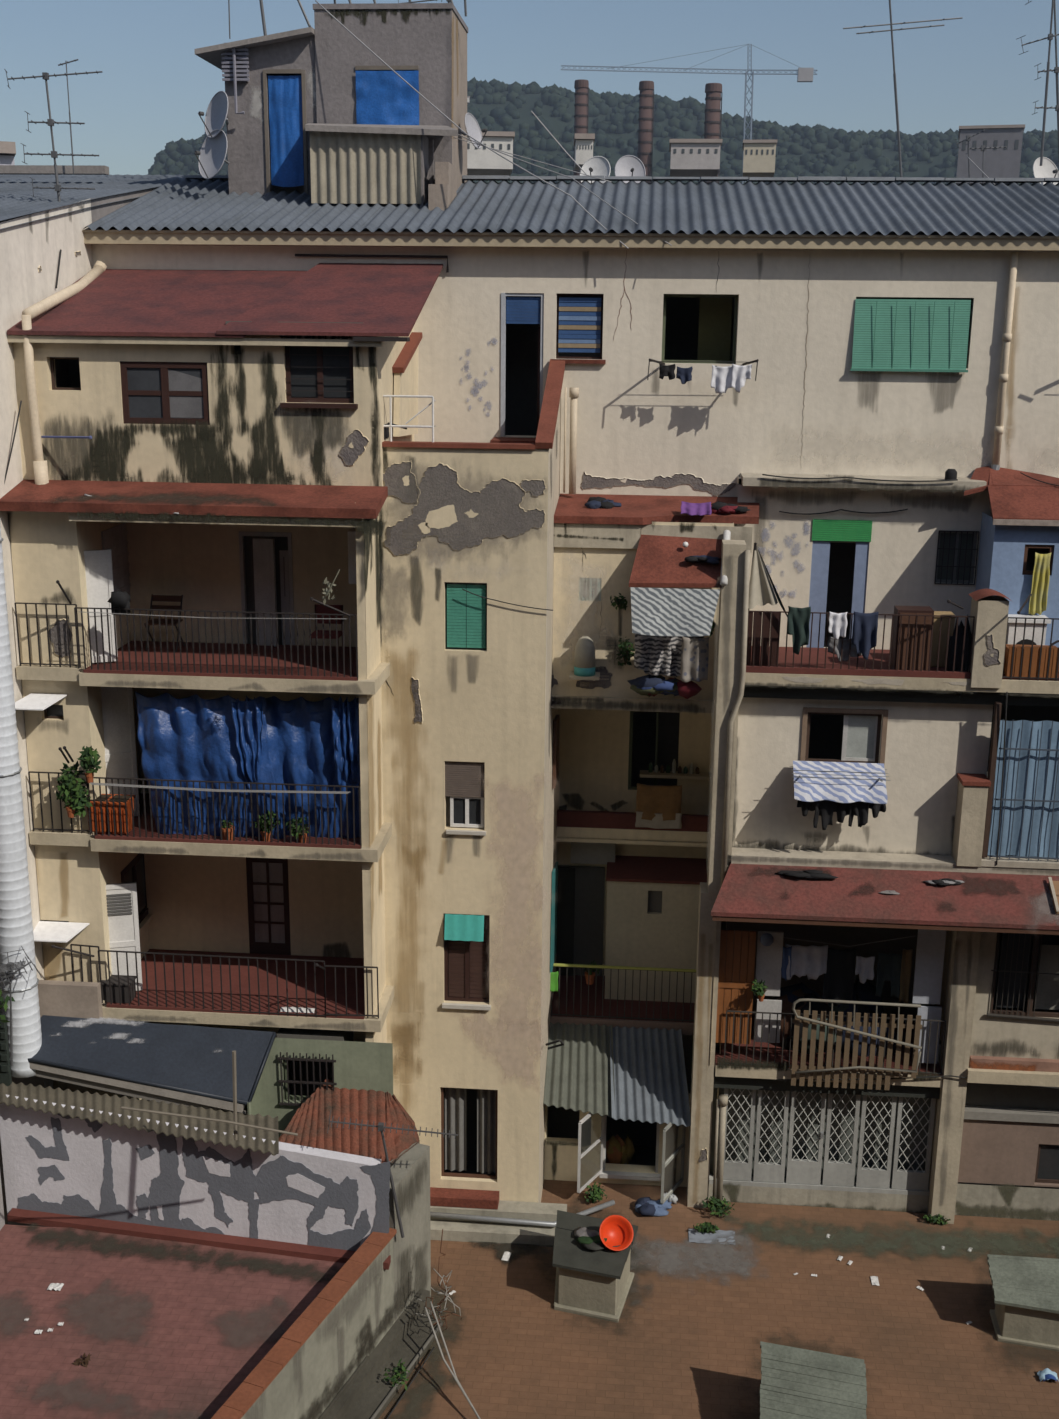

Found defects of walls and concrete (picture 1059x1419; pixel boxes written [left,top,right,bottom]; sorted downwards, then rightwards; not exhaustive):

crack [613,250,632,340]
flaking render [339,429,369,466]
water stain [43,335,388,644]
flaking render [383,461,546,556]
flaking render [581,472,736,496]
water stain [411,557,441,623]
water stain [977,1042,1036,1056]
peeling [25,1113,103,1186]
peeling [360,1161,390,1233]
water stain [27,1223,339,1282]
water stain [217,1298,288,1347]
water stain [301,1250,427,1419]